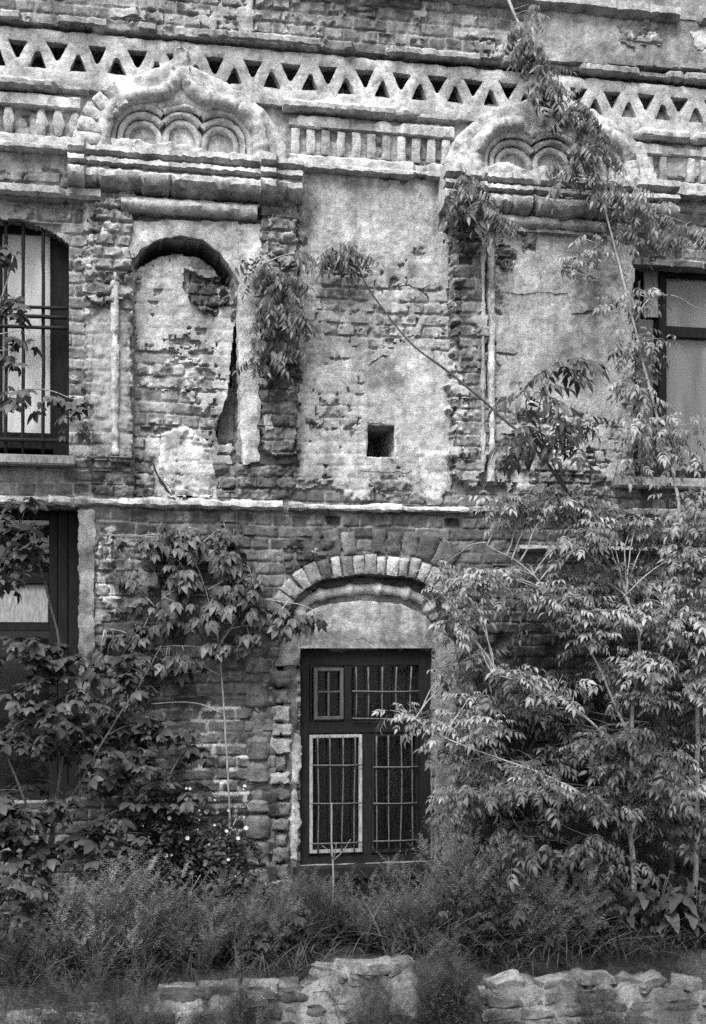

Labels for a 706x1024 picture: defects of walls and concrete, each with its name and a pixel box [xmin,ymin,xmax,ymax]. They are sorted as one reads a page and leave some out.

spalling [83,198,134,306]
flaking render [188,271,229,315]
spalling [448,279,481,368]
flaking render [135,357,204,394]
crack [193,322,263,468]
spalling [369,473,411,498]